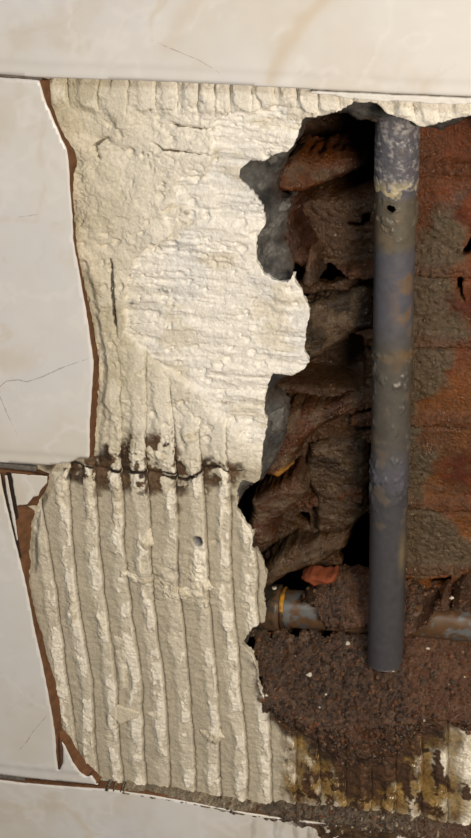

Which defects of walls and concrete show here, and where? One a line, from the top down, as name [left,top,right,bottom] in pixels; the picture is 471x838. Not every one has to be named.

spalling [253,152,288,191]
spalling [257,196,291,266]
spalling [239,406,285,489]
peeling [54,468,69,506]
peeling [83,473,95,520]
peeling [110,477,122,532]
crack [80,463,243,481]
peeling [137,528,154,551]
peeling [119,570,213,600]
peeling [69,591,77,631]
damp [285,730,463,822]
damp [297,822,435,838]